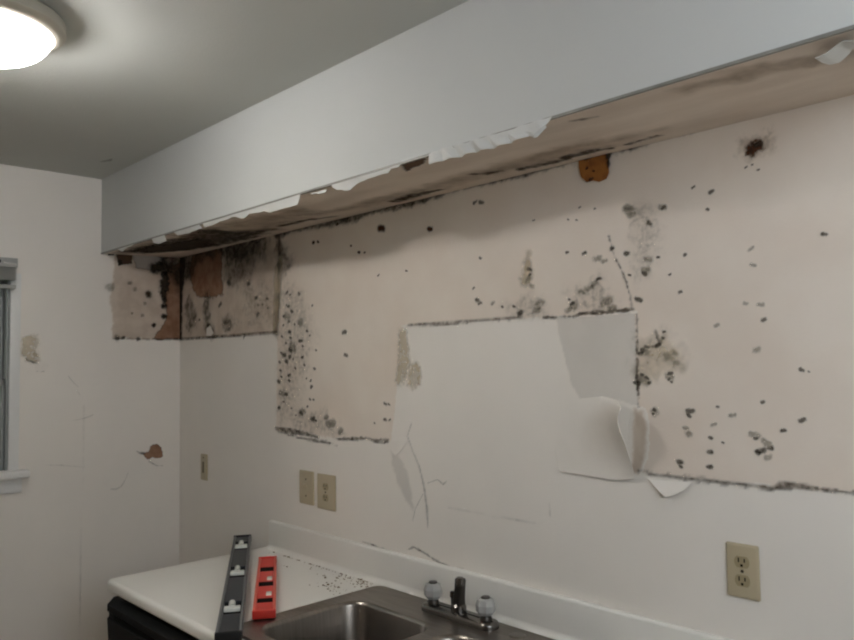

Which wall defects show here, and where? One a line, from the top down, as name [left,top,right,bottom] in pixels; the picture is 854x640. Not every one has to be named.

peeling [815,40,854,65]
leakage [472,135,658,184]
leakage [118,189,444,340]
leakage [277,291,335,426]
peeling [108,95,854,514]